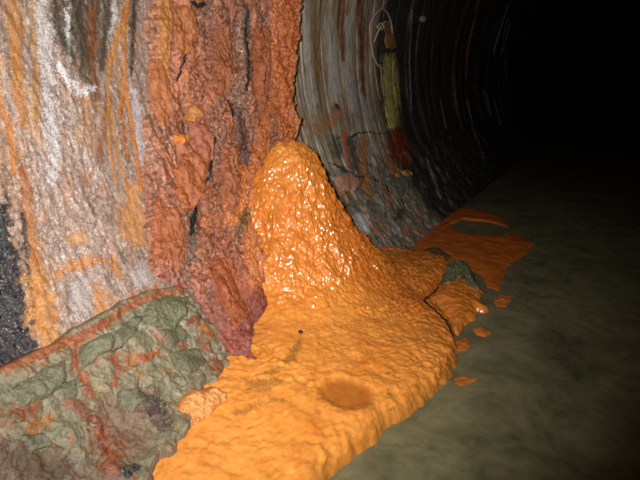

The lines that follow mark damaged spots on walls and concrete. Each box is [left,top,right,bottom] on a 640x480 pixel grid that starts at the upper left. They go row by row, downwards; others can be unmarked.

rust [1,0,40,128]
water stain [25,0,97,188]
water stain [98,0,117,72]
rust [85,0,163,266]
water stain [0,194,39,366]
water stain [63,270,97,323]
rust [0,96,189,478]
rust [187,312,224,375]
crack [423,287,454,337]
water stain [142,385,174,429]
water stain [0,439,74,480]
water stain [116,464,140,477]